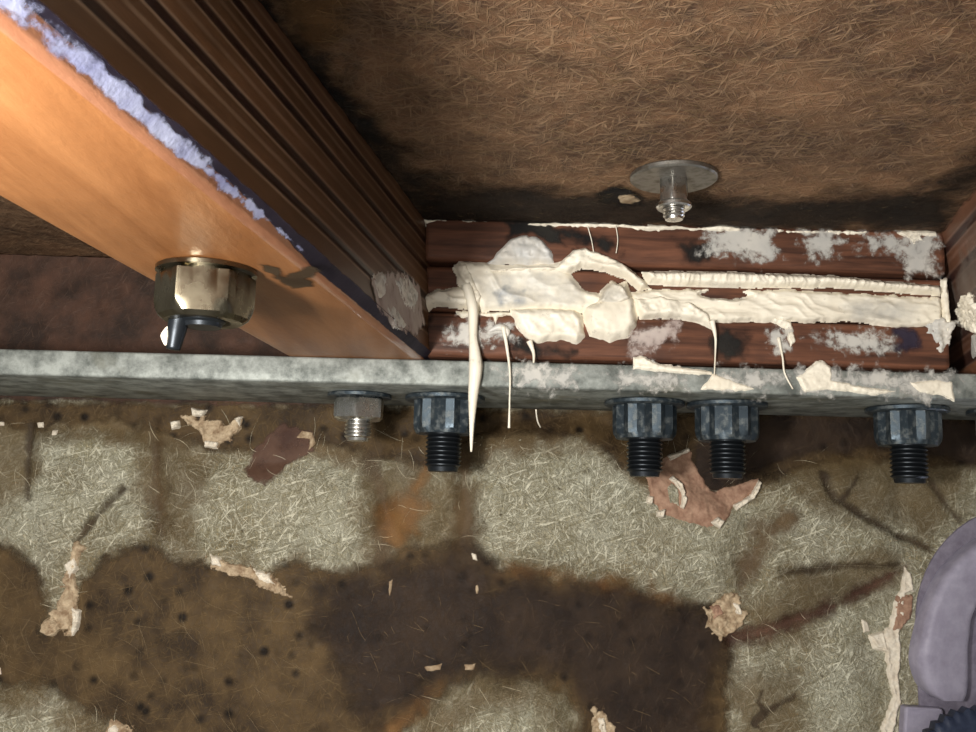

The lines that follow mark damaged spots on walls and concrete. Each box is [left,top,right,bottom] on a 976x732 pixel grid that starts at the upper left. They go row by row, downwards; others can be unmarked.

damp [258,0,976,231]
damp [0,254,288,356]
spalling [645,448,762,529]
damp [660,413,976,524]
damp [0,395,732,732]